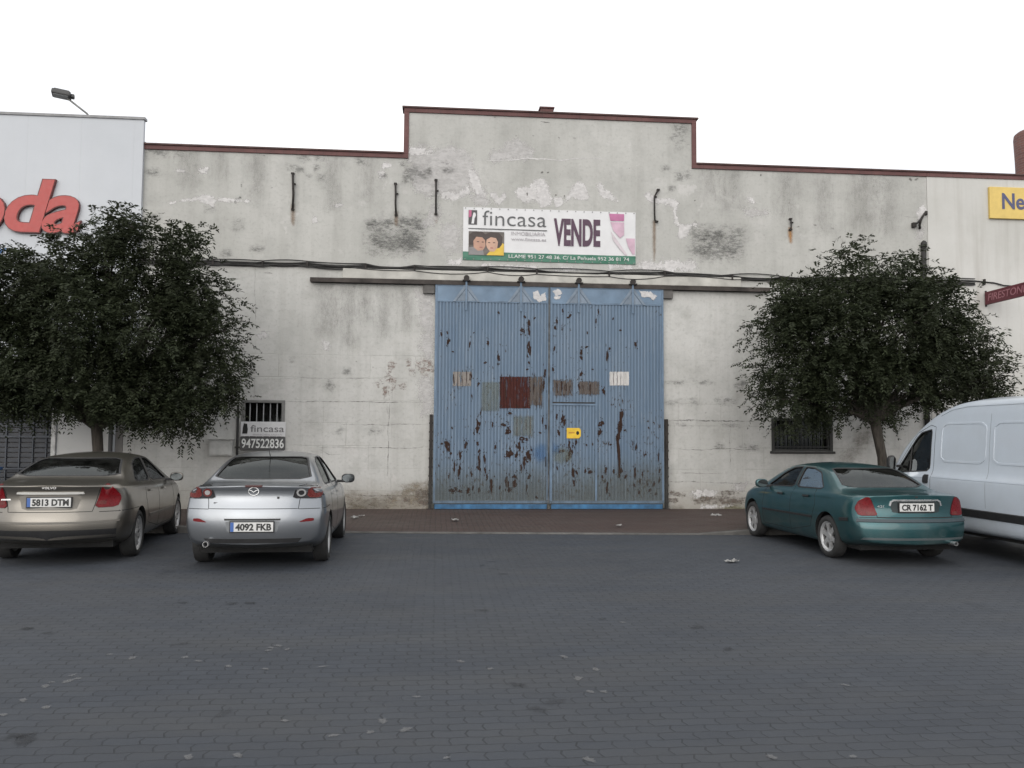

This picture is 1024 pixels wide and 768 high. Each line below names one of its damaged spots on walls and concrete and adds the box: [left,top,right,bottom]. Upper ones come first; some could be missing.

leakage [368,219,420,250]
peeling [408,146,618,265]
peeling [643,192,699,239]
corrosion [499,315,605,409]
spalling [438,378,748,509]
corrosion [616,411,626,481]